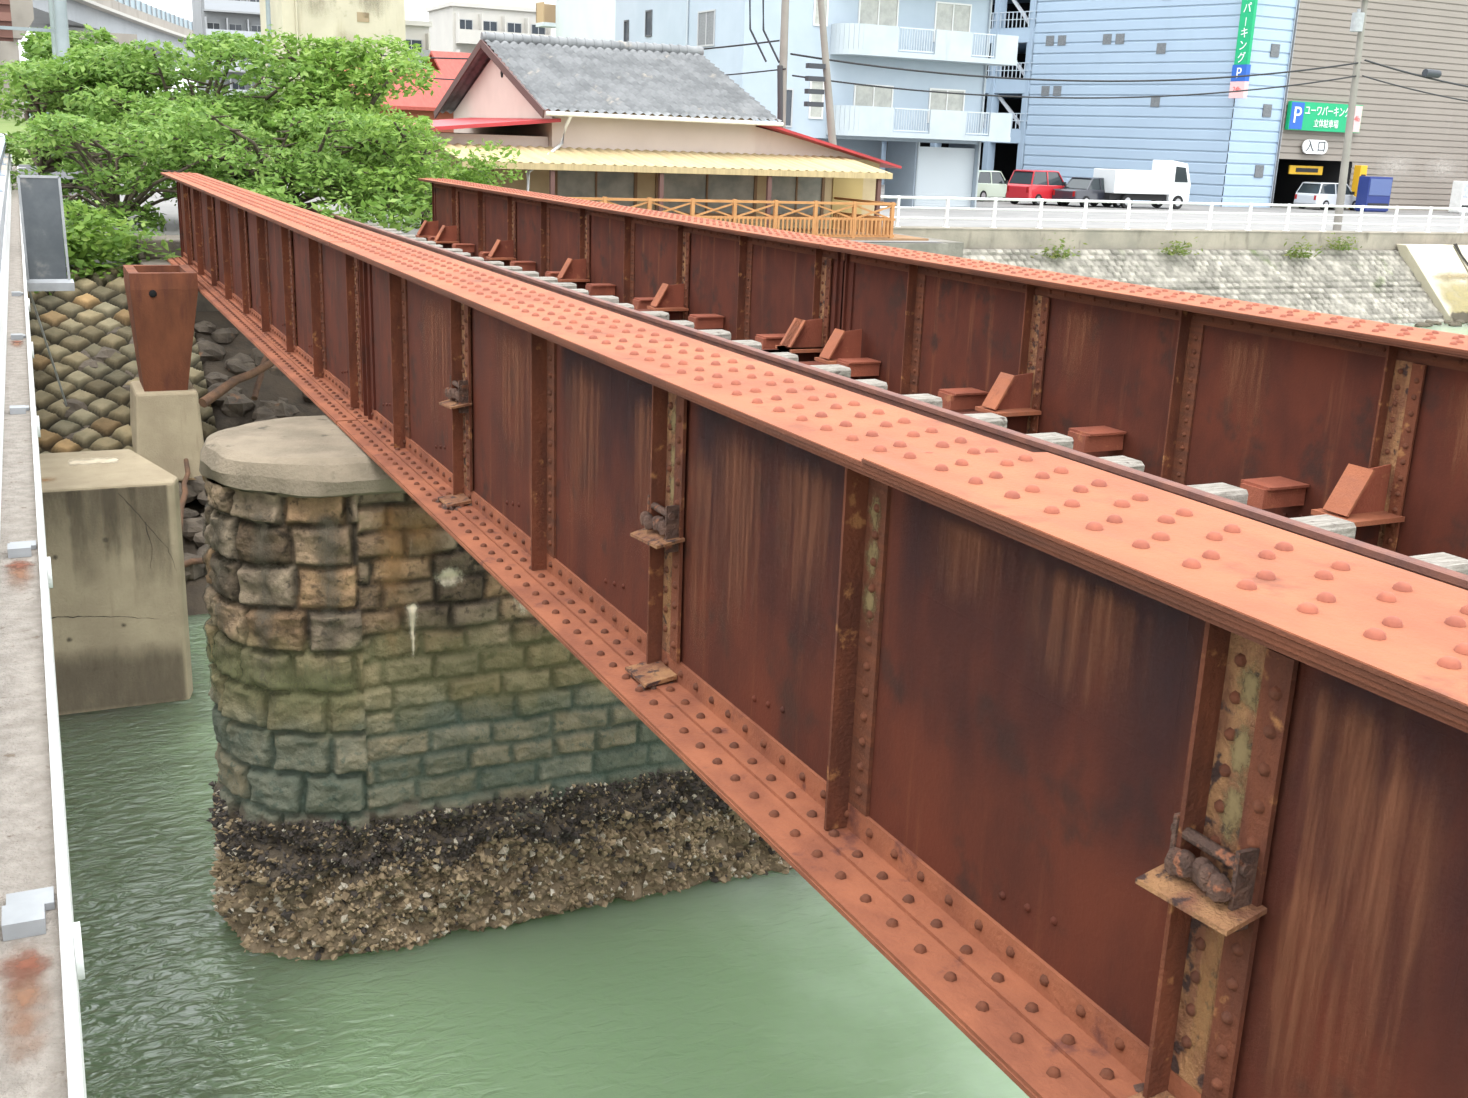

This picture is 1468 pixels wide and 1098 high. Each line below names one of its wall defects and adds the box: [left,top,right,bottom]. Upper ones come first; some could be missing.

corrosion [7,561,33,580]
peeling [1220,668,1260,840]
corrosion [5,950,46,1034]